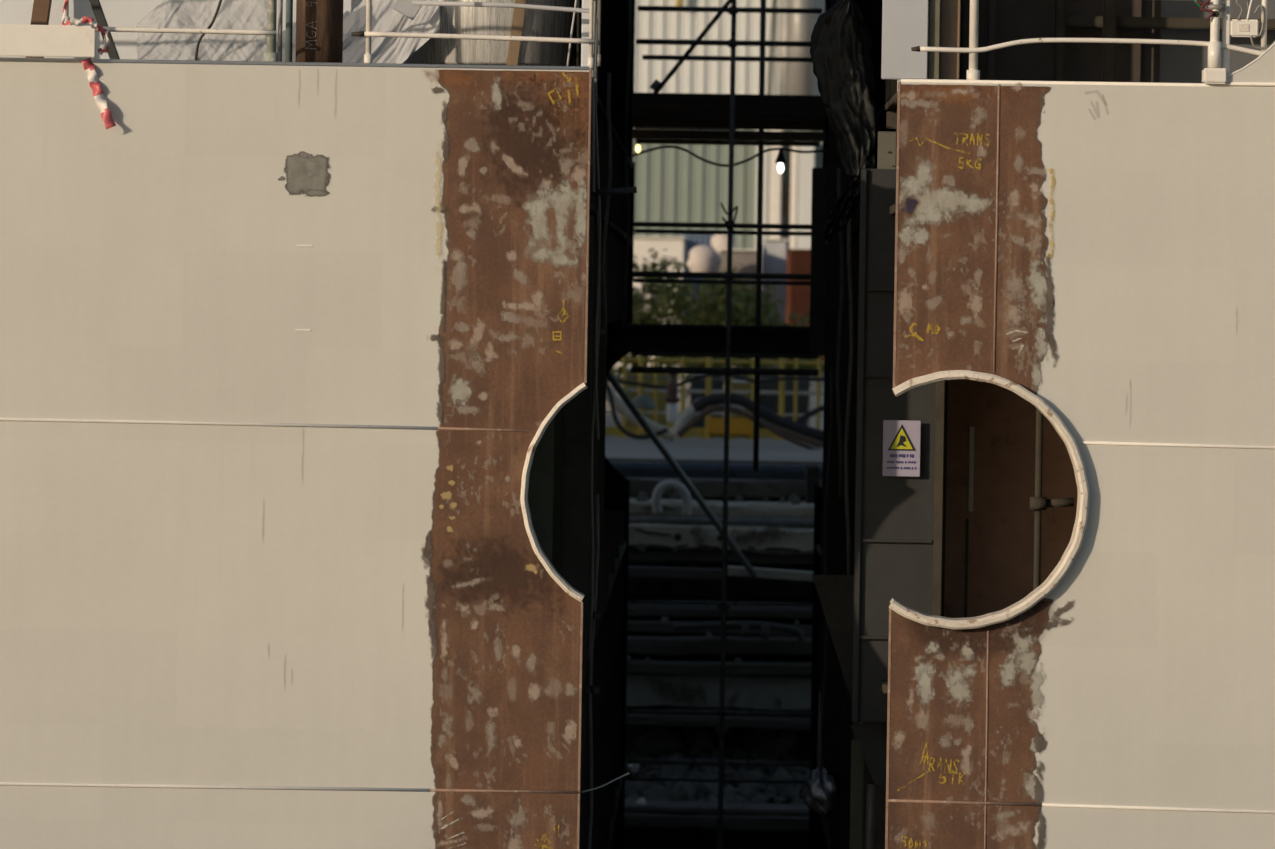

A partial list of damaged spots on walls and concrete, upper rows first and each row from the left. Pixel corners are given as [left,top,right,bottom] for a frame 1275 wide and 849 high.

corrosion [437,71,480,87]
corrosion [902,84,992,103]
corrosion [490,70,589,193]
peeling [278,151,331,197]
peeling [1010,156,1045,206]
peeling [1007,218,1048,386]
peeling [439,465,458,533]
corrosion [445,545,553,603]
corrosion [919,601,1044,652]
peeling [999,633,1044,722]
peeling [439,718,458,769]
peeling [1025,775,1036,799]